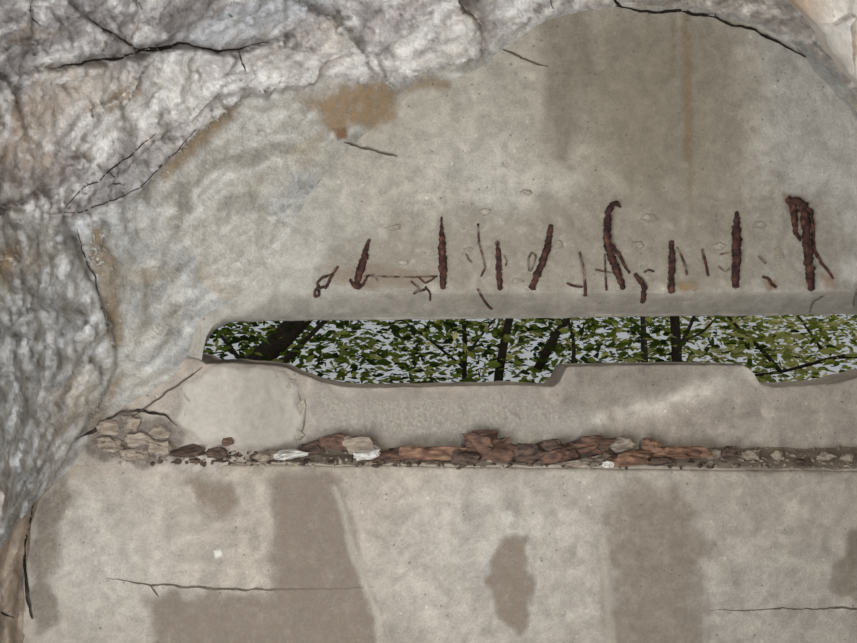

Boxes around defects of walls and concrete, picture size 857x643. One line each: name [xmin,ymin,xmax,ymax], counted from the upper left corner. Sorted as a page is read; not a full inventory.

corrosion [437,216,448,290]
corrosion [529,224,554,290]
corrosion [603,201,648,304]
corrosion [731,211,743,289]
corrosion [785,195,834,291]
flaking render [86,365,307,467]
spalling [316,384,589,443]
crack [1,503,35,619]
crack [107,578,330,597]
damp [152,473,379,643]
damp [486,539,533,632]
crack [710,604,857,612]